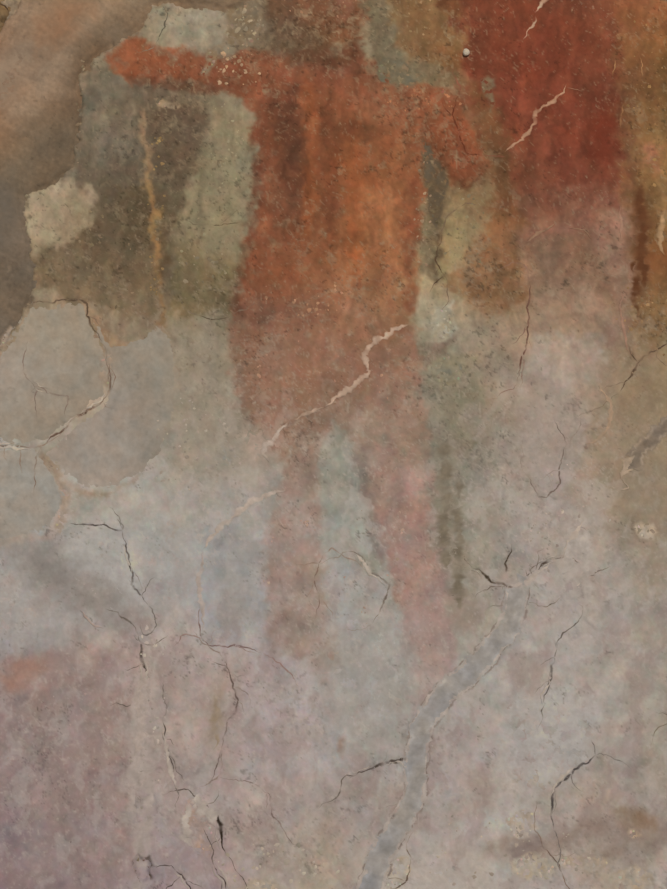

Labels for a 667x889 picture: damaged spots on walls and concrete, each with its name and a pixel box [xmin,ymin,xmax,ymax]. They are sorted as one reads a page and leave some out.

peeling [216,8,264,85]
spalling [152,96,186,111]